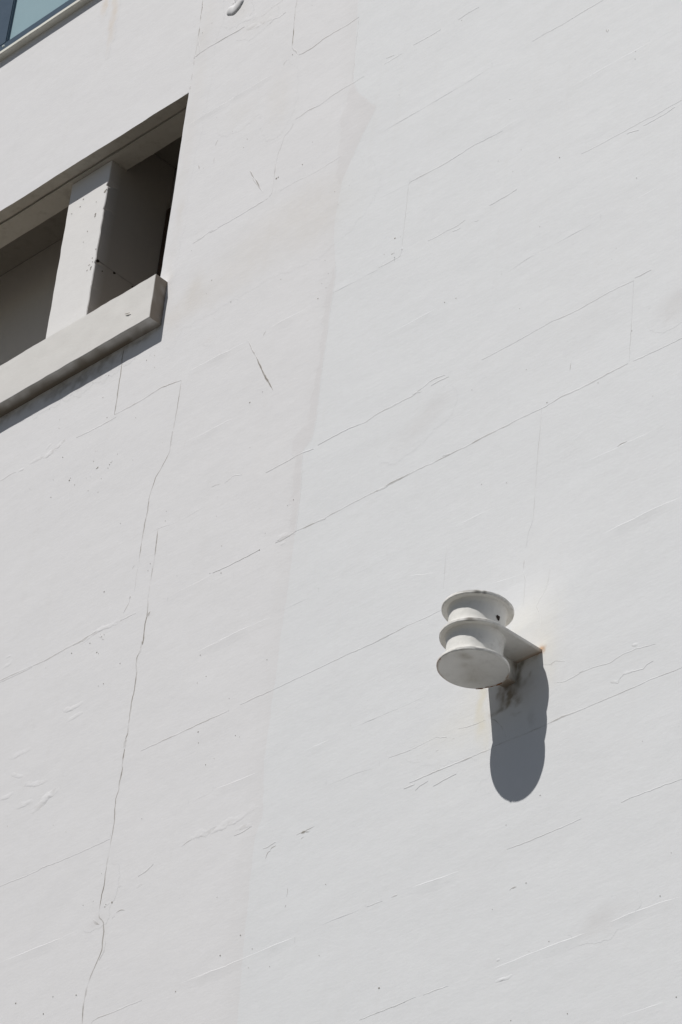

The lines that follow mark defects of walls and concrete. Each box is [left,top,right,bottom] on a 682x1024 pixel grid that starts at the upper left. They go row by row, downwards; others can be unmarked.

crack [213,271,682,573]
crack [0,350,447,1024]
crack [389,644,680,790]